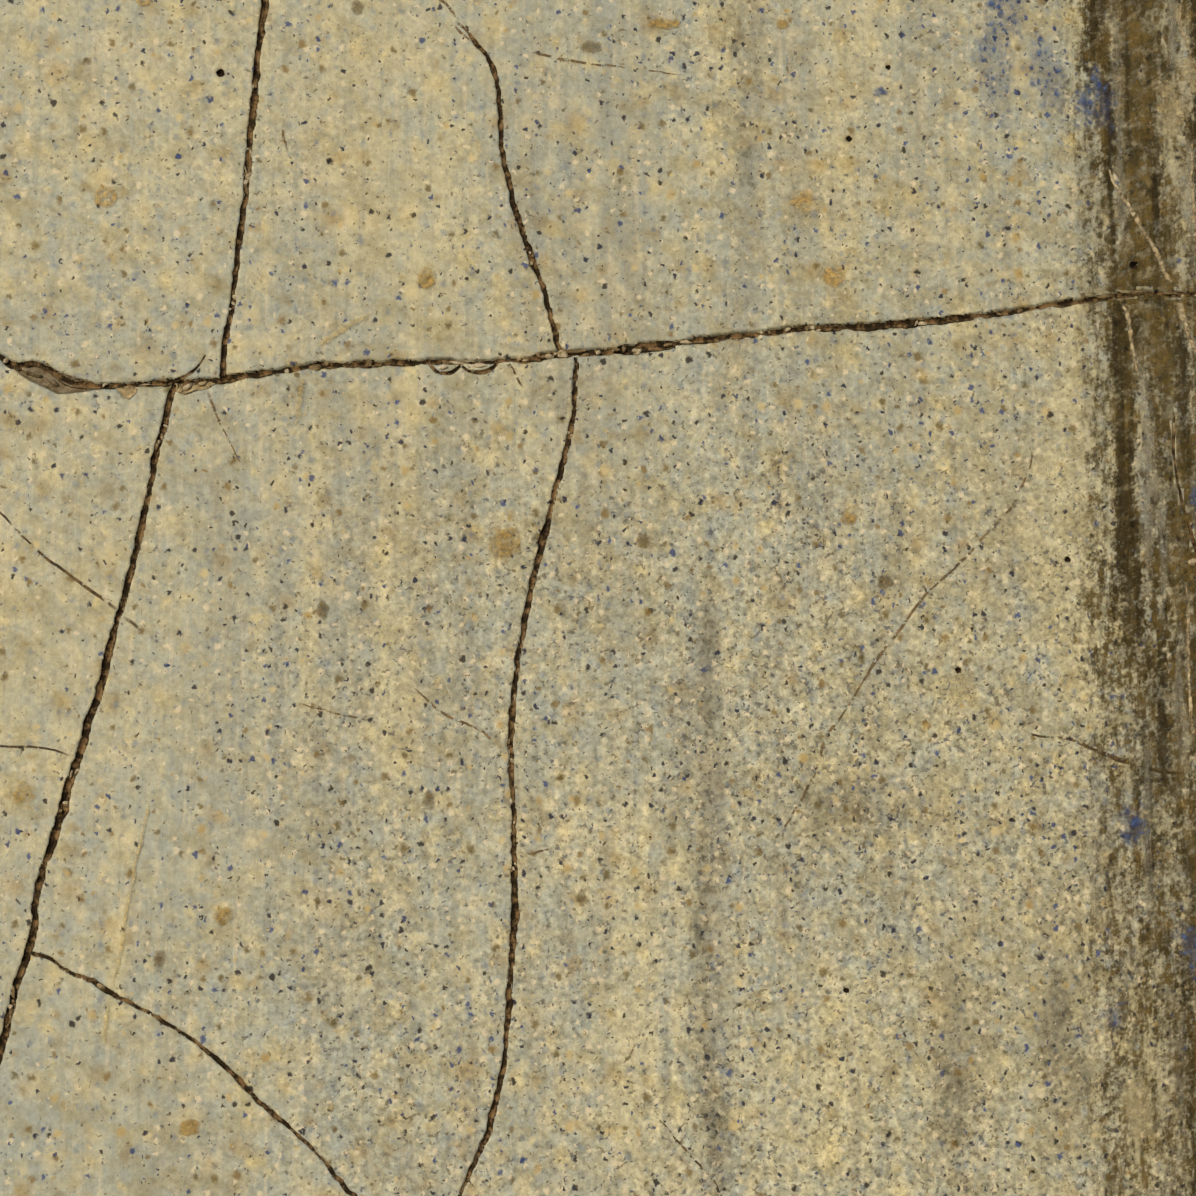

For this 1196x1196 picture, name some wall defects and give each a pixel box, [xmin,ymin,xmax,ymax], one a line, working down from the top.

crack [0,0,1196,389]
crack [0,383,176,1064]
crack [210,399,240,462]
crack [305,704,363,720]
crack [417,691,491,739]
crack [458,357,579,1196]
water stain [1029,0,1196,1196]
crack [32,951,358,1196]